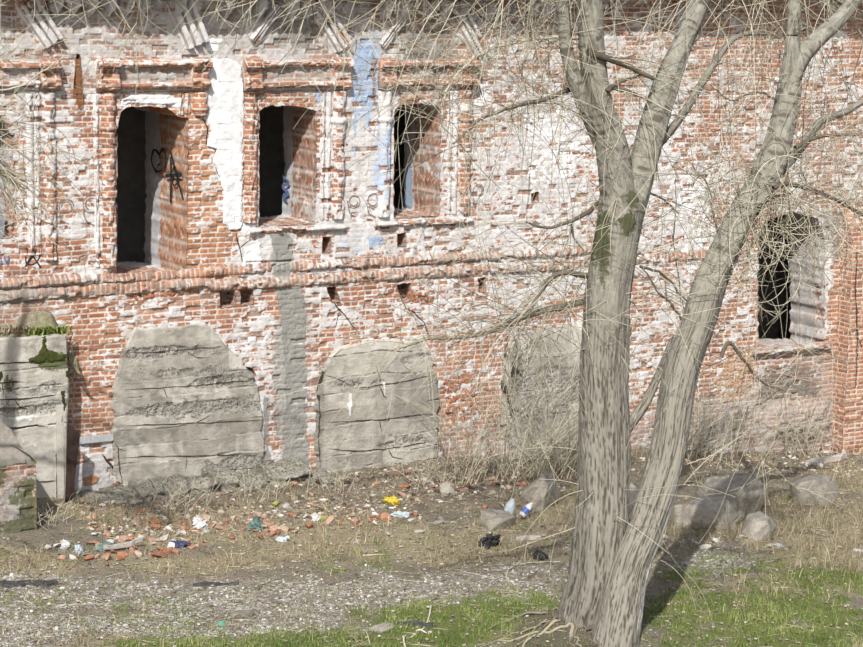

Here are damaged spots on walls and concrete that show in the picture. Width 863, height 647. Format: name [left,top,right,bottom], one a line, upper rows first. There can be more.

flaking render [121,95,178,110]
flaking render [203,30,262,269]
flaking render [521,102,587,184]
spalling [133,274,192,301]
spalling [409,289,434,303]
crack [854,234,862,398]